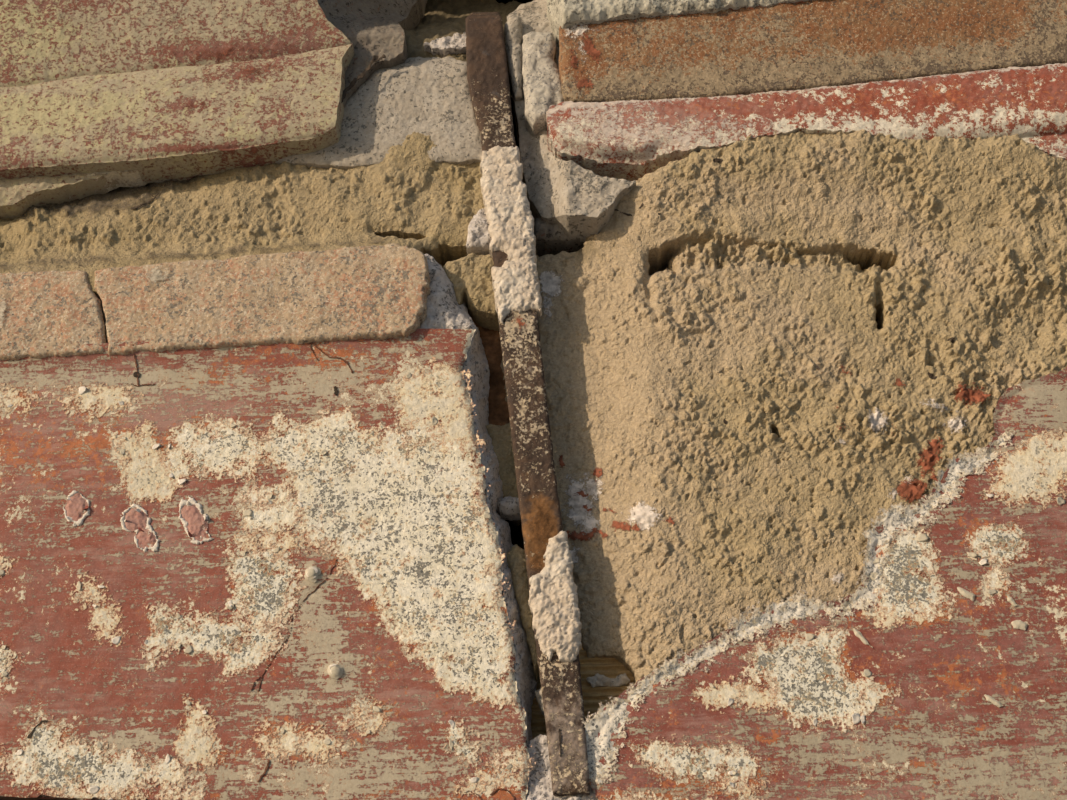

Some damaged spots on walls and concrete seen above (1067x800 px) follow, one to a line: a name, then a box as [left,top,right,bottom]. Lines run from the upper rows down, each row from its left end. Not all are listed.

crack [131,184,166,210]
spalling [466,208,491,255]
peeling [0,327,545,800]
spalling [582,382,1067,800]